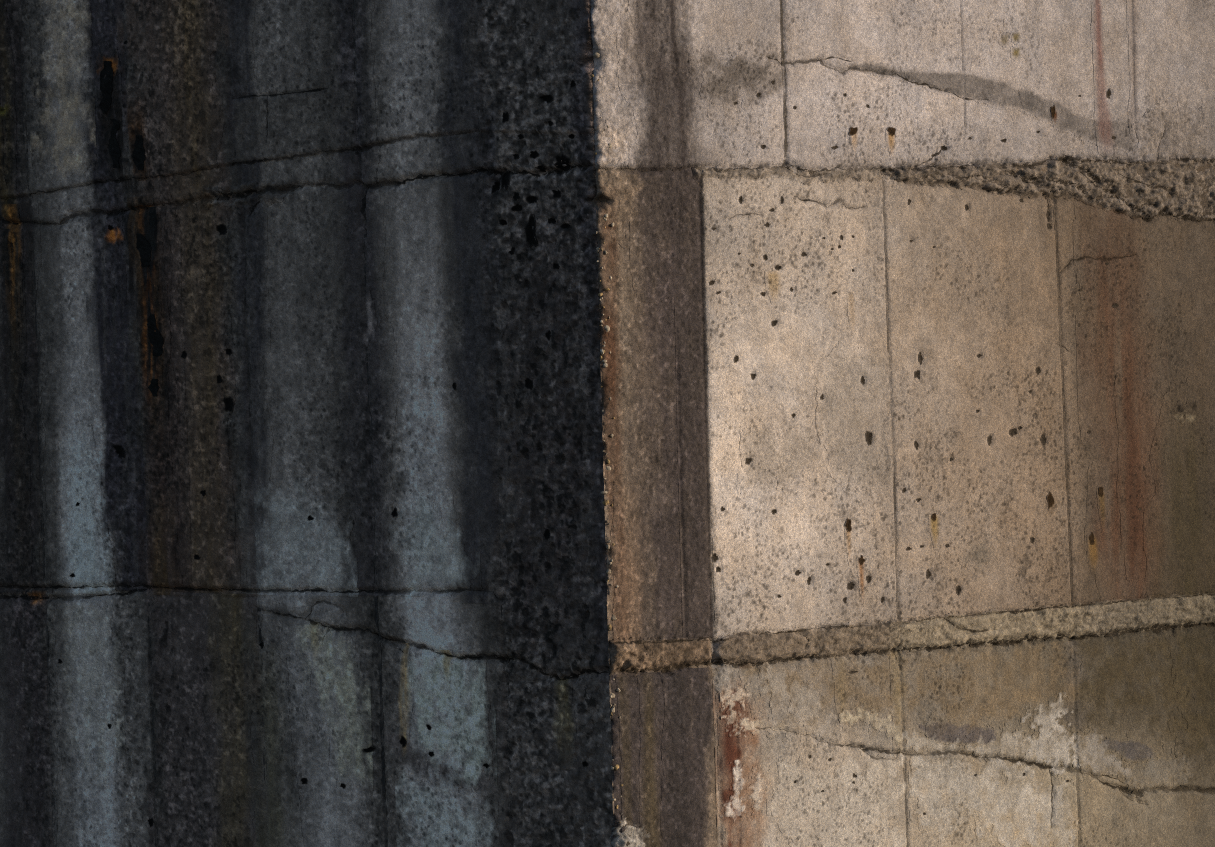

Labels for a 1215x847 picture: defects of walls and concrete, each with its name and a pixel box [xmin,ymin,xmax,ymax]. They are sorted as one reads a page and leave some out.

corrosion [124,96,151,185]
crack [0,88,1215,237]
spalling [692,101,1215,229]
corrosion [1091,0,1116,156]
damp [56,213,152,594]
damp [114,0,402,847]
damp [379,0,1196,847]
spalling [601,434,619,587]
crack [0,584,1215,680]
spalling [607,592,1215,720]
corrosion [713,667,775,847]
crack [754,726,1215,828]